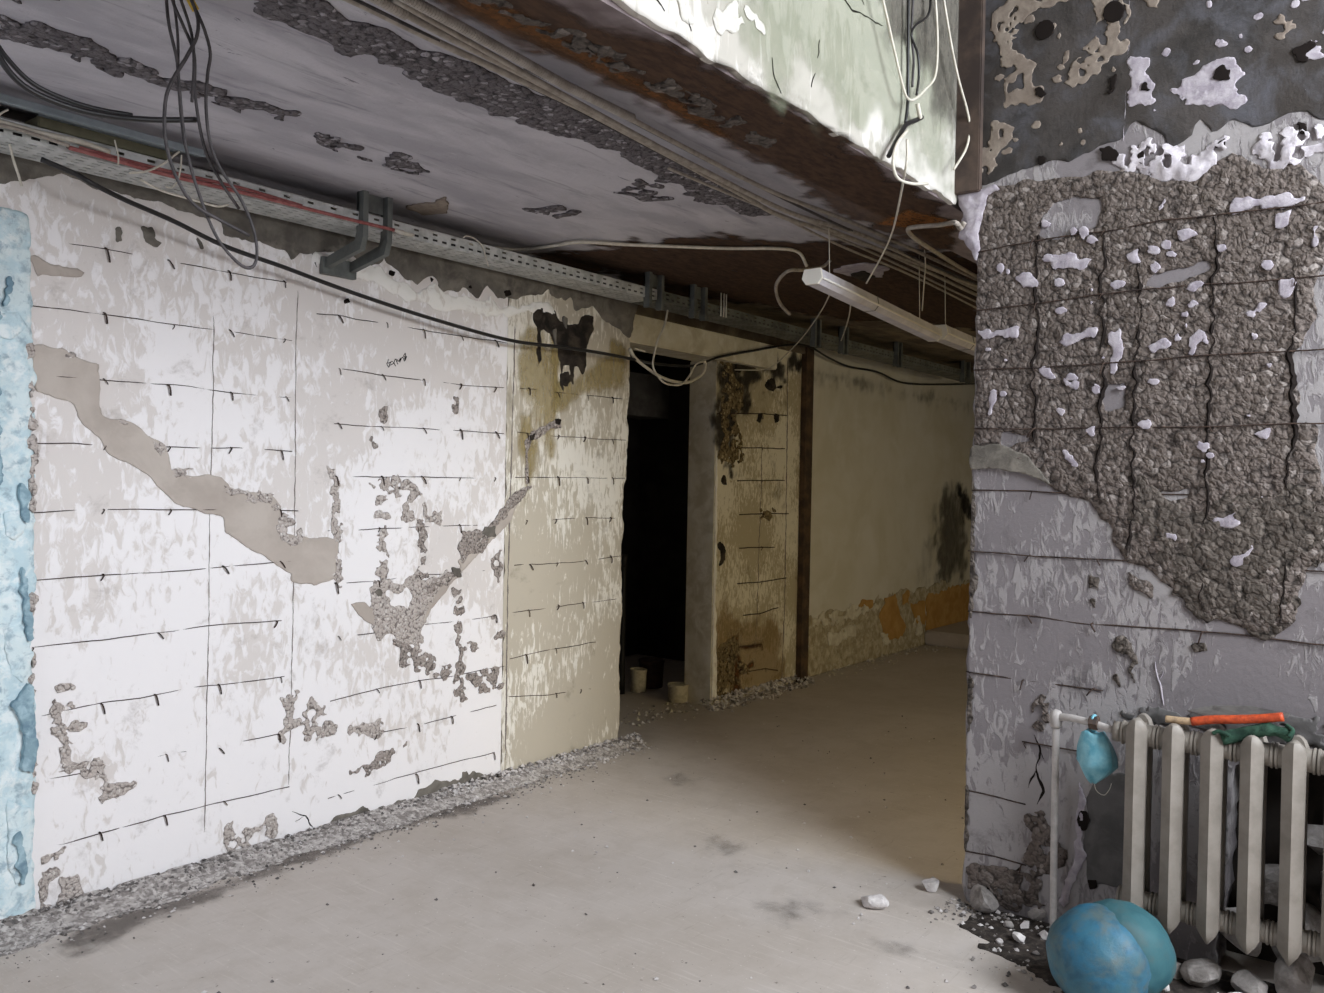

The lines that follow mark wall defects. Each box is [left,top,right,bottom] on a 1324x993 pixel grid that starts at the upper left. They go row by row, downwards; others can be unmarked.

peeling [0,207,344,919]
flaking render [0,153,638,391]
spalling [351,419,562,702]
spalling [253,0,772,217]
water stain [519,328,626,477]
corrosion [431,0,978,331]
water stain [957,484,971,519]
crack [1029,234,1041,442]
spalling [808,0,1324,677]
crack [1093,233,1143,556]
crack [1202,216,1221,524]
crack [1279,273,1300,623]